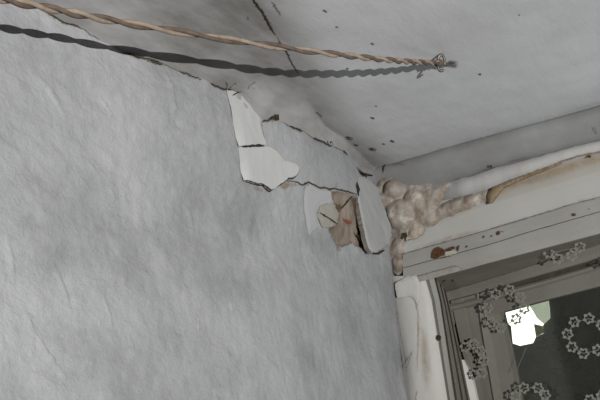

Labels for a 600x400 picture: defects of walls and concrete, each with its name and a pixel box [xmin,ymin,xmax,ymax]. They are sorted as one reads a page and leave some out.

crack [48,13,98,39]
crack [248,0,299,76]
crack [122,51,256,95]
peeling [227,90,300,192]
crack [263,114,348,155]
crack [289,180,355,194]
crack [358,163,405,177]
spalling [303,184,369,255]
rust [431,246,468,259]